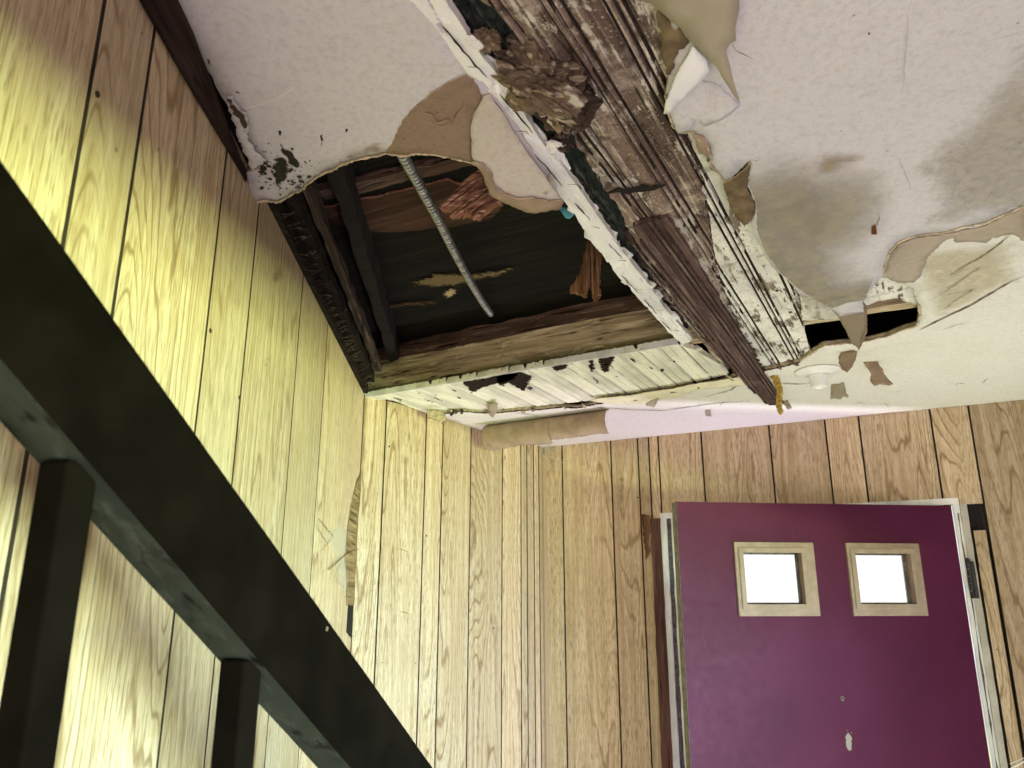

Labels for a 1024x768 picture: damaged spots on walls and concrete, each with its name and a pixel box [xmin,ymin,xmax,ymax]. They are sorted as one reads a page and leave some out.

peeling [641,0,740,104]
peeling [225,95,267,172]
leakage [258,131,320,196]
peeling [386,73,482,163]
leakage [753,181,870,308]
peeling [883,208,1024,283]
peeling [442,373,746,418]
peeling [588,357,617,382]
spalling [761,303,922,377]